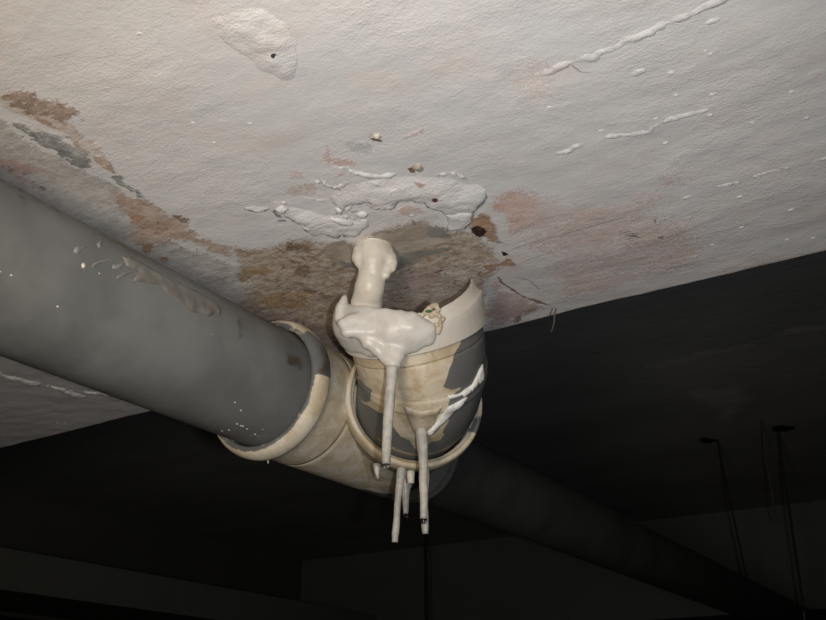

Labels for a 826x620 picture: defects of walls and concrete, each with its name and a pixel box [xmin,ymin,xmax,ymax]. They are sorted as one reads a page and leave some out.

damp [0,120,543,469]
peeling [244,164,487,239]